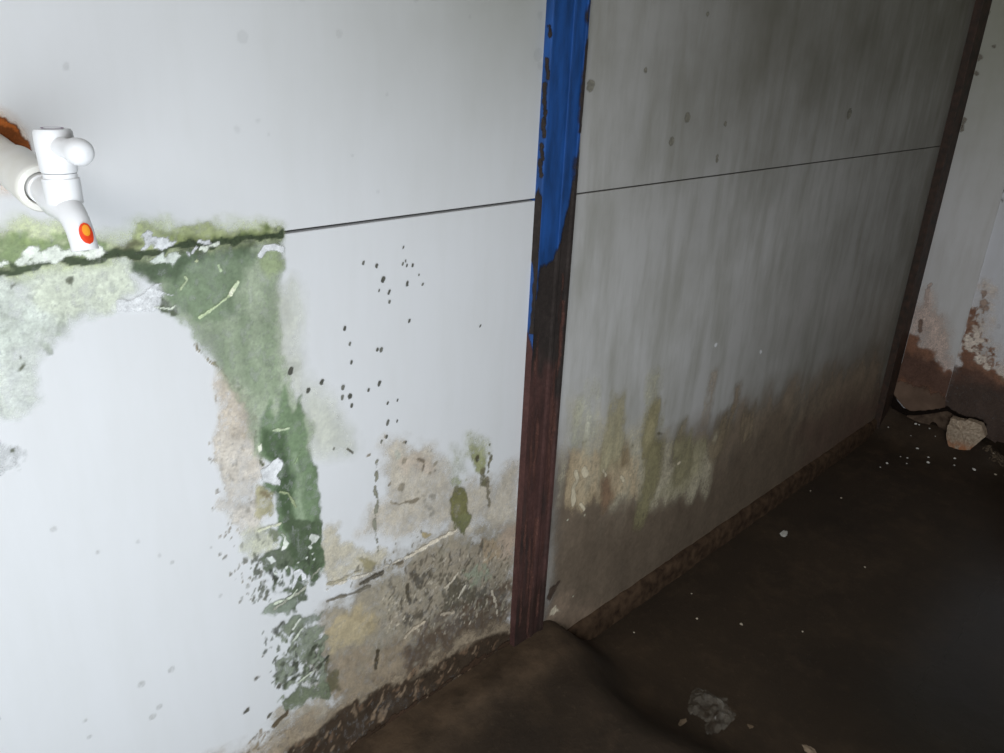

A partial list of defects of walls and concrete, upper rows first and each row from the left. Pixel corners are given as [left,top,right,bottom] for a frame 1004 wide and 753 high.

rust [0,115,31,150]
peeling [141,230,220,265]
peeling [258,244,284,258]
peeling [0,245,175,418]
rust [510,38,589,647]
rust [898,283,1004,443]
damp [196,345,277,576]
peeling [261,458,283,485]
damp [600,374,692,527]
peeling [267,534,319,589]
damp [239,420,518,751]
damp [547,581,560,615]